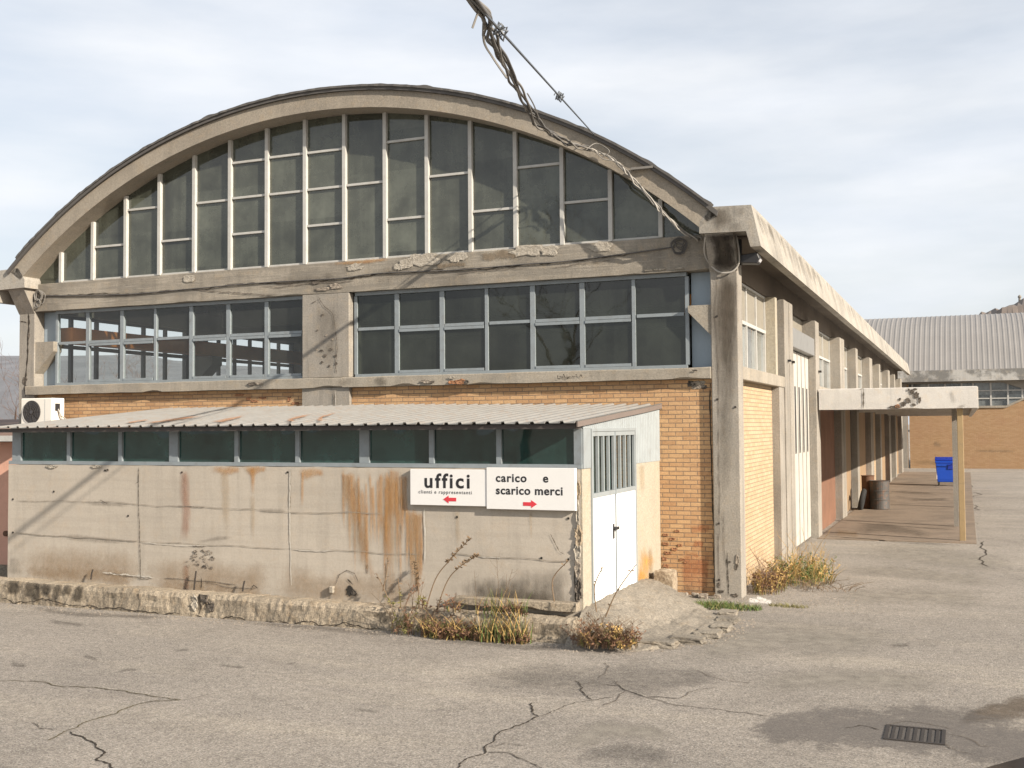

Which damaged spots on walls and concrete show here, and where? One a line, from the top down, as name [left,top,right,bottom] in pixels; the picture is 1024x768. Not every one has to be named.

peeling [394,252,468,270]
peeling [483,245,559,260]
peeling [586,241,613,252]
peeling [889,388,921,409]
crack [832,486,989,567]
crack [1,680,215,768]
crack [458,662,766,768]